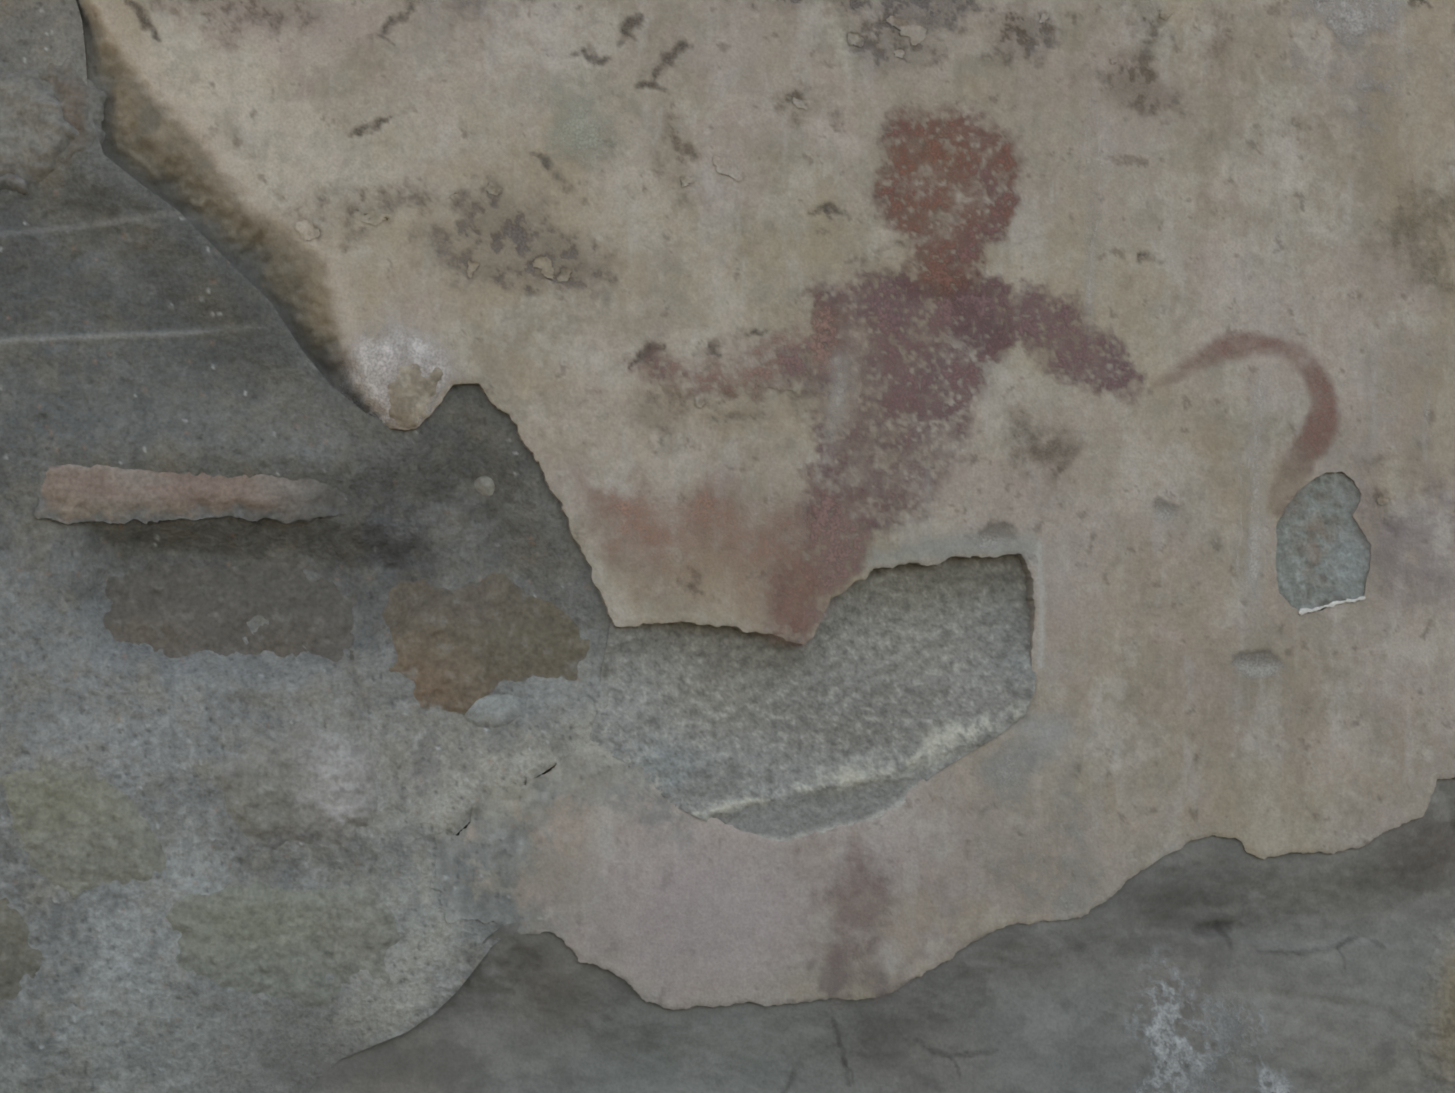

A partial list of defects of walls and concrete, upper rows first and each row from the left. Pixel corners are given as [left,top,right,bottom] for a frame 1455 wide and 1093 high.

spalling [0,0,1036,1093]
spalling [1276,472,1370,616]
spalling [307,778,1455,1093]
water stain [1128,951,1263,1093]
water stain [1258,1063,1290,1093]